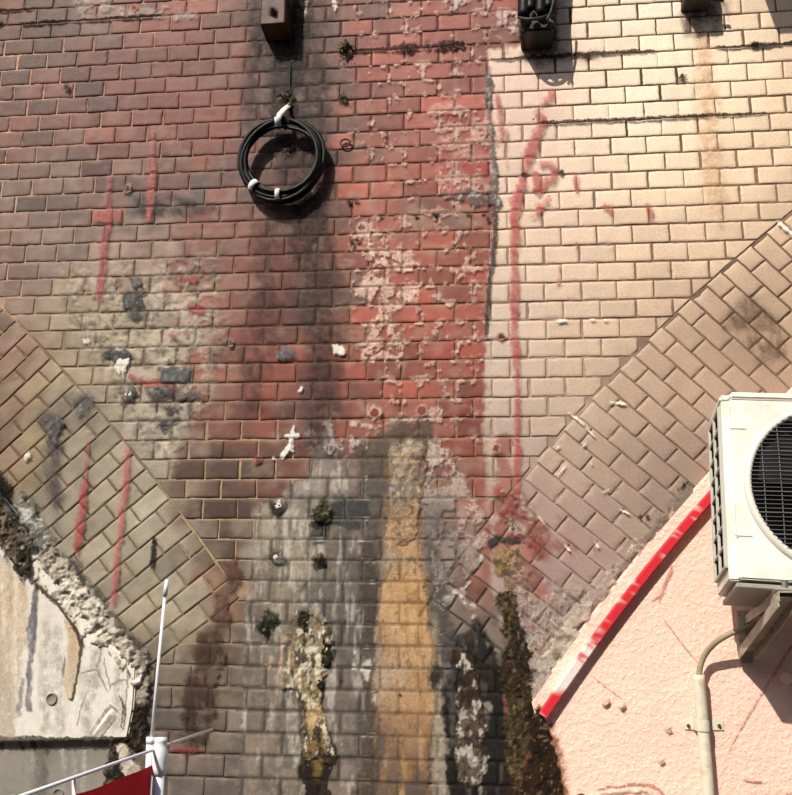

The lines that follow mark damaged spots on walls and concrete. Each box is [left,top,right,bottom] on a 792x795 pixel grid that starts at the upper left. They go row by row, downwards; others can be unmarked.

crack [0,7,161,25]
water stain [496,8,518,32]
crack [717,40,792,48]
water stain [434,93,508,192]
crack [537,112,766,124]
crack [414,49,655,337]
peeling [417,206,482,302]
peeling [378,361,475,402]
water stain [179,153,568,795]
peeling [10,490,150,706]
rust [352,436,438,795]
peeling [115,743,141,776]